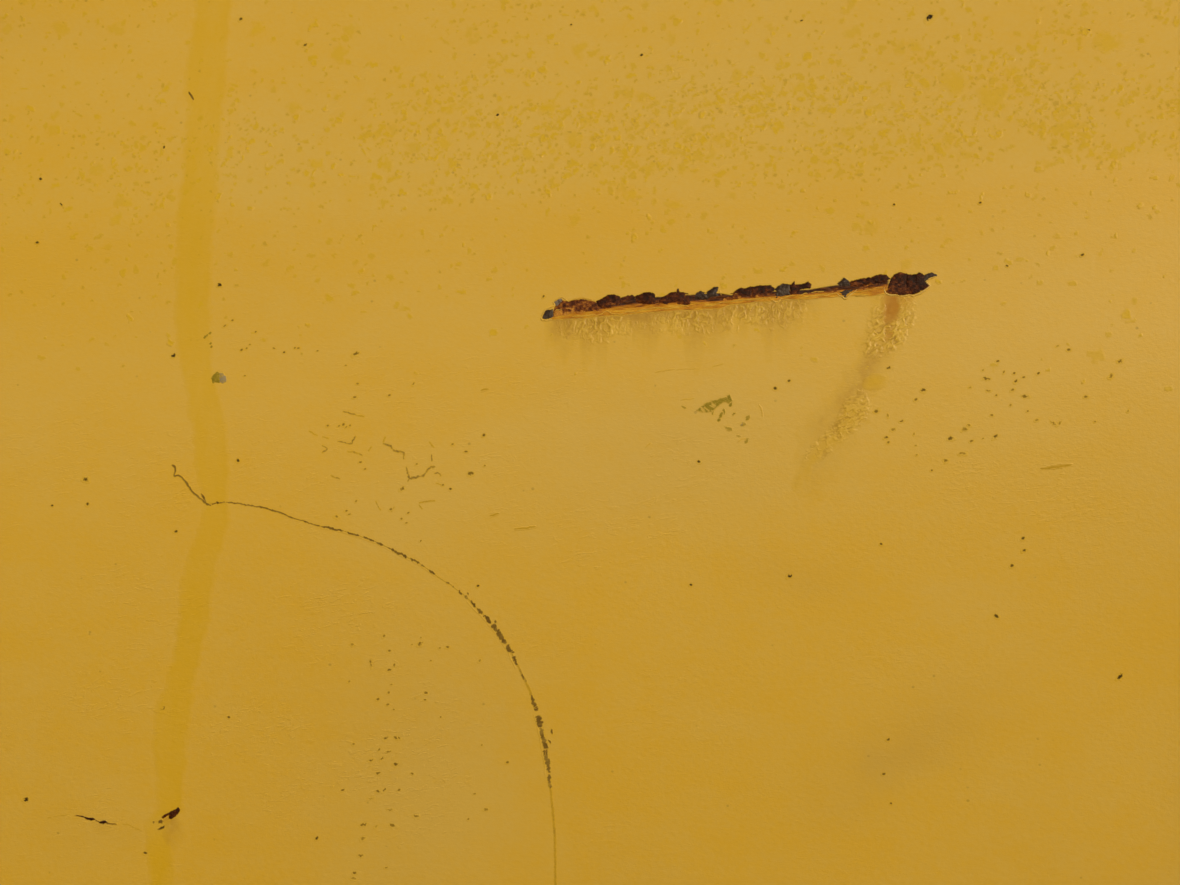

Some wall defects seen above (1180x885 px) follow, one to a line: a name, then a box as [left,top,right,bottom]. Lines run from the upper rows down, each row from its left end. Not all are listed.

rust [553,288,691,317]
crack [308,410,442,510]
crack [171,464,557,885]